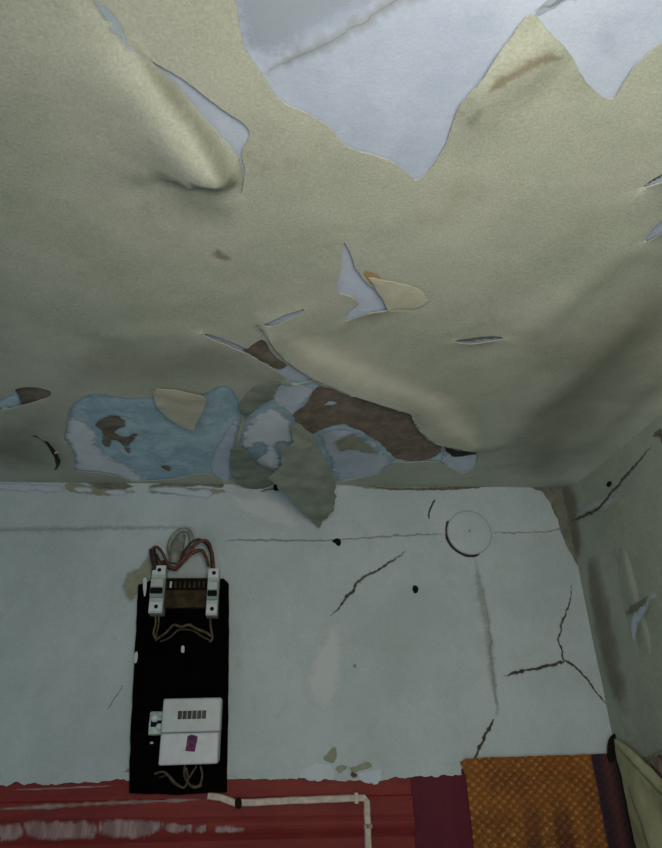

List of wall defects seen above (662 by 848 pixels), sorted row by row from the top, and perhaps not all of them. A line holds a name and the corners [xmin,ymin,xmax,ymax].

peeling [0,483,133,496]
peeling [149,483,225,498]
crack [575,429,662,520]
crack [330,551,405,616]
crack [507,586,604,701]